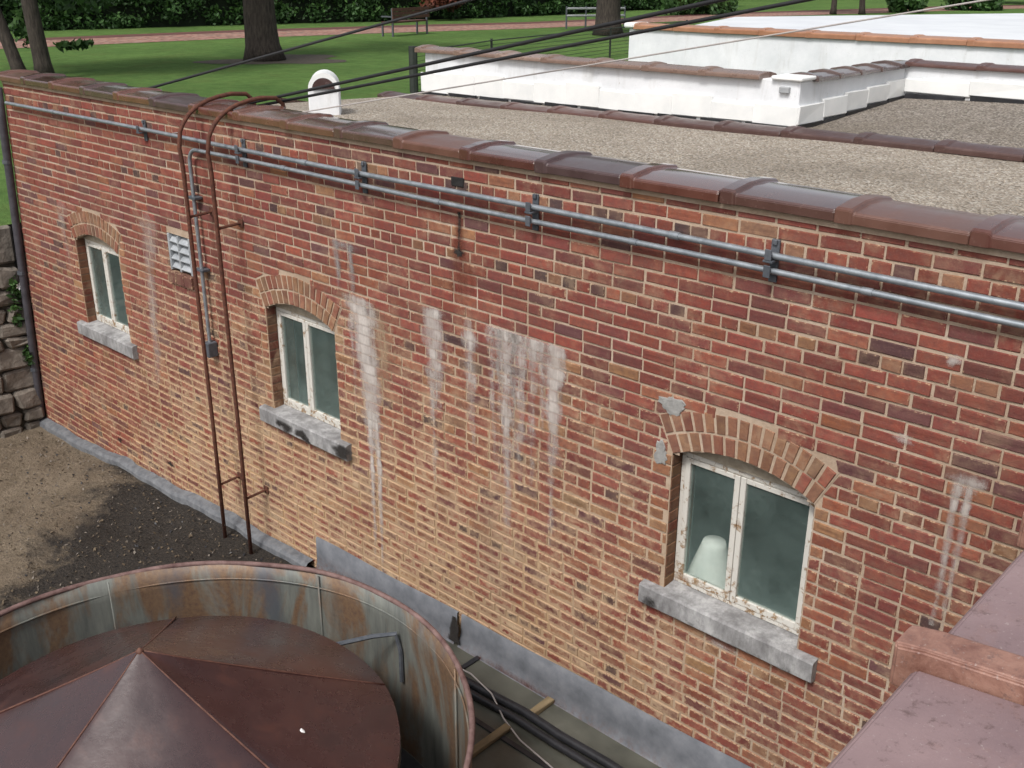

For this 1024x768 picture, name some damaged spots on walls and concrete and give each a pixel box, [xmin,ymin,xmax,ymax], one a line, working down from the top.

water stain [426,309,441,384]
water stain [464,331,475,383]
water stain [348,296,387,522]
water stain [492,328,565,487]
water stain [949,479,981,523]